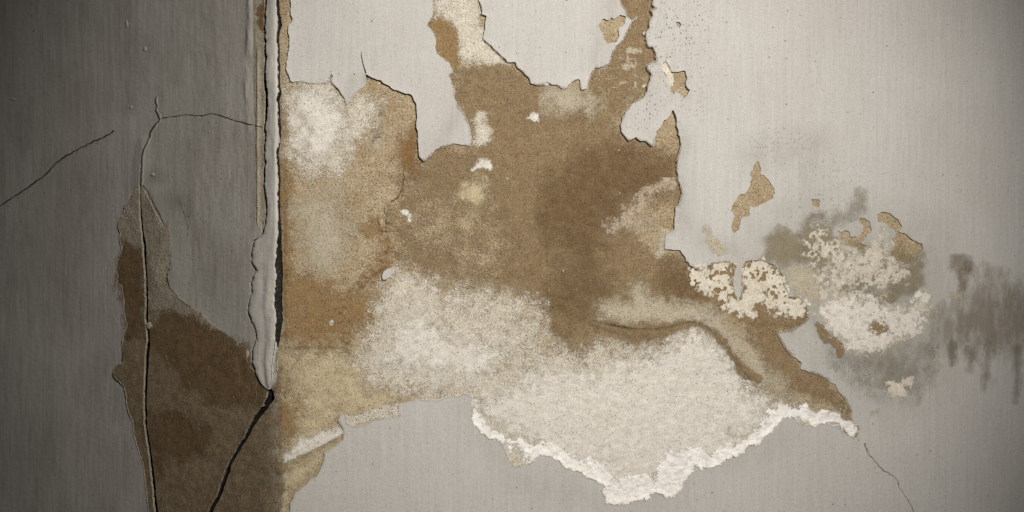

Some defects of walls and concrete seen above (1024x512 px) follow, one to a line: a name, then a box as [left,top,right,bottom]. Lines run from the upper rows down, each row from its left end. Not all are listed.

crack [0,130,116,209]
crack [140,0,282,512]
leakage [113,0,858,512]
peeling [248,0,859,512]
leakage [765,224,937,357]
crack [864,443,914,512]